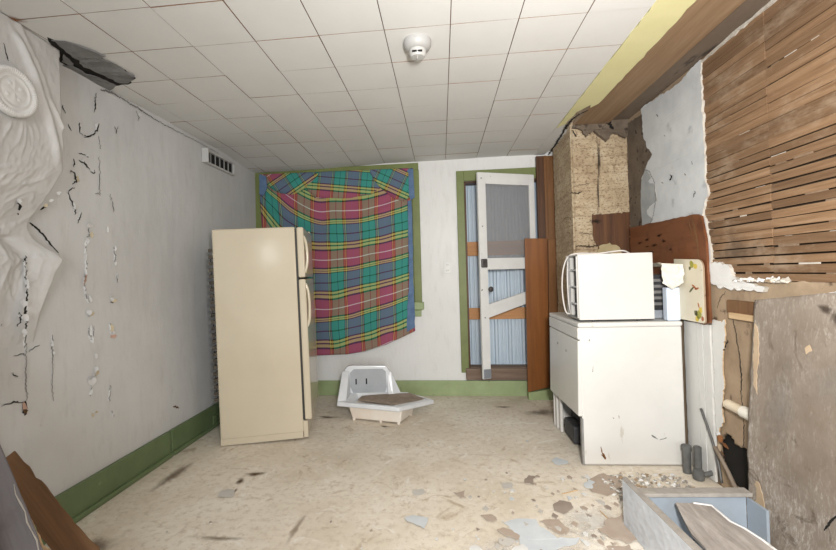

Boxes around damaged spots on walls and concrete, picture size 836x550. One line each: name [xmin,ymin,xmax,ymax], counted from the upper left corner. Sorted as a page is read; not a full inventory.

flaking render [572,0,836,292]
spalling [715,431,749,490]